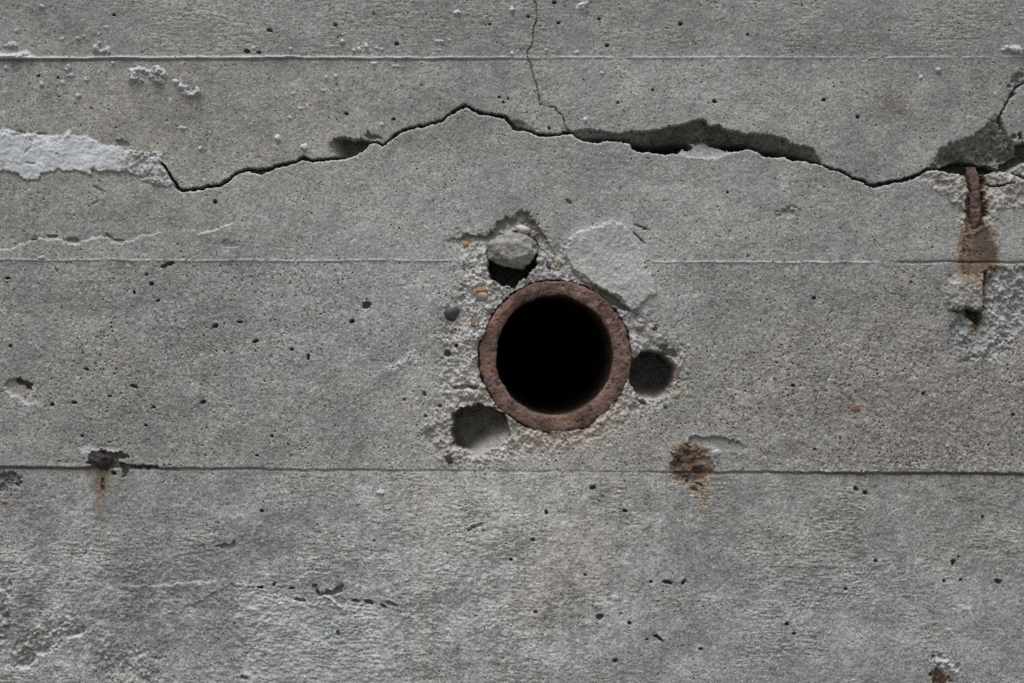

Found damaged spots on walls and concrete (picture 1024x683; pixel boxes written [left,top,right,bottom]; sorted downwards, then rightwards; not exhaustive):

crack [159,0,938,194]
spalling [116,144,174,189]
spalling [920,70,1024,235]
corrosion [954,220,1003,276]
spalling [418,206,693,475]
spalling [940,262,1024,365]
corrosion [83,467,113,543]
corrosion [667,441,729,516]